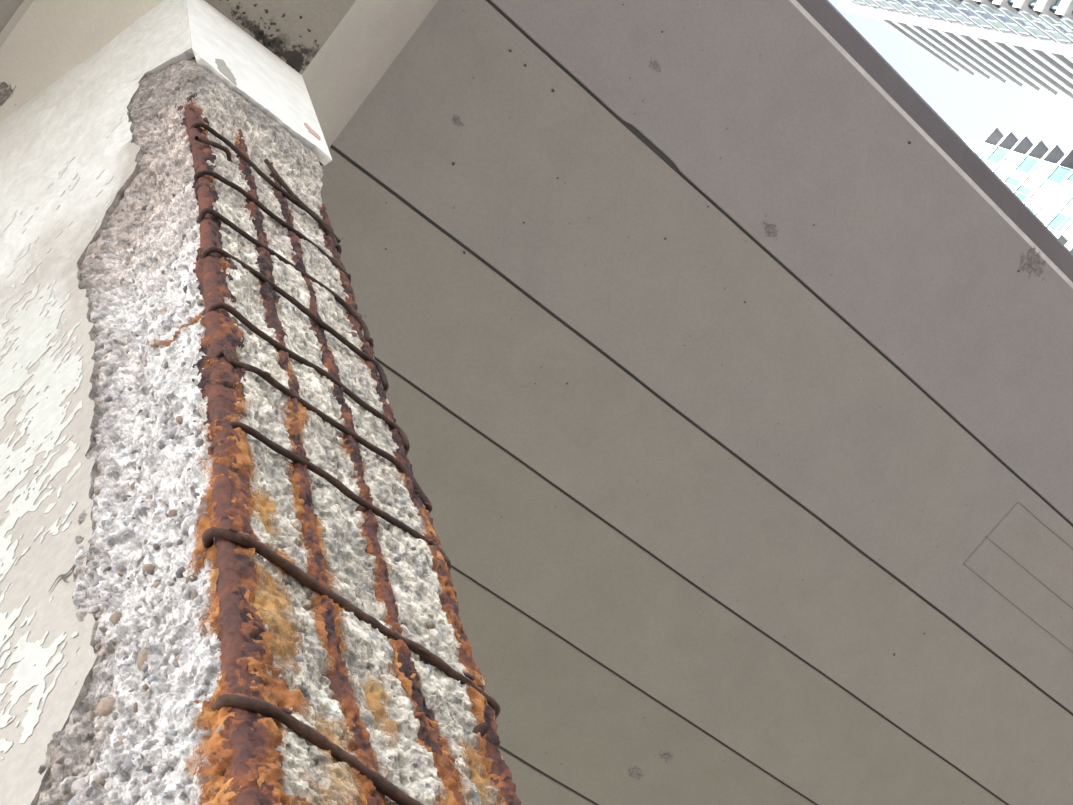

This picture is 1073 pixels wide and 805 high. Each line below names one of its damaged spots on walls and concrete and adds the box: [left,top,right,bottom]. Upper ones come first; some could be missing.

leakage [220,0,319,73]
rust [151,313,205,347]
spalling [0,35,521,805]
rust [186,347,310,805]
rust [284,401,398,805]
rust [389,627,421,710]
rust [397,468,462,643]
rust [423,654,507,805]